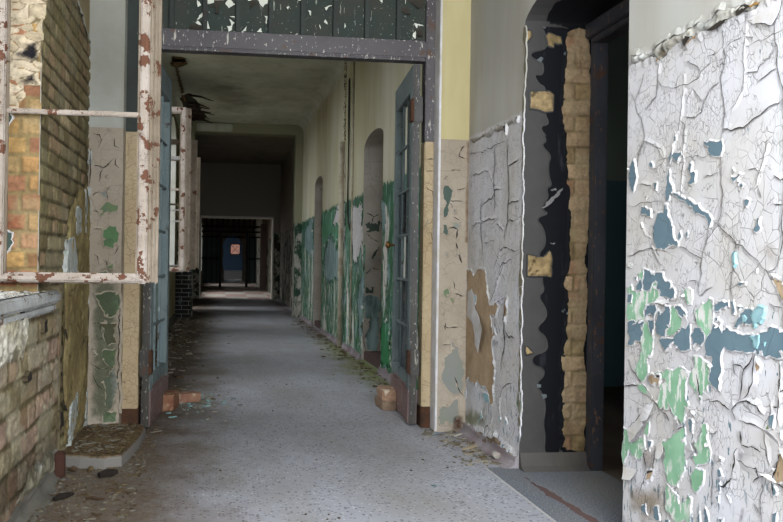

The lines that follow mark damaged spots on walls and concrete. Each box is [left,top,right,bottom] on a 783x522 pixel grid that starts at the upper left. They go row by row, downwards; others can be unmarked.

peeling [190,0,269,33]
peeling [628,0,783,72]
peeling [62,187,121,273]
peeling [304,197,391,369]
crack [426,140,521,431]
peeling [435,25,586,456]
peeling [627,158,639,194]
peeling [640,132,714,251]
crack [628,0,783,300]
peeling [704,138,725,158]
peeling [88,290,123,424]
peeling [621,262,783,522]